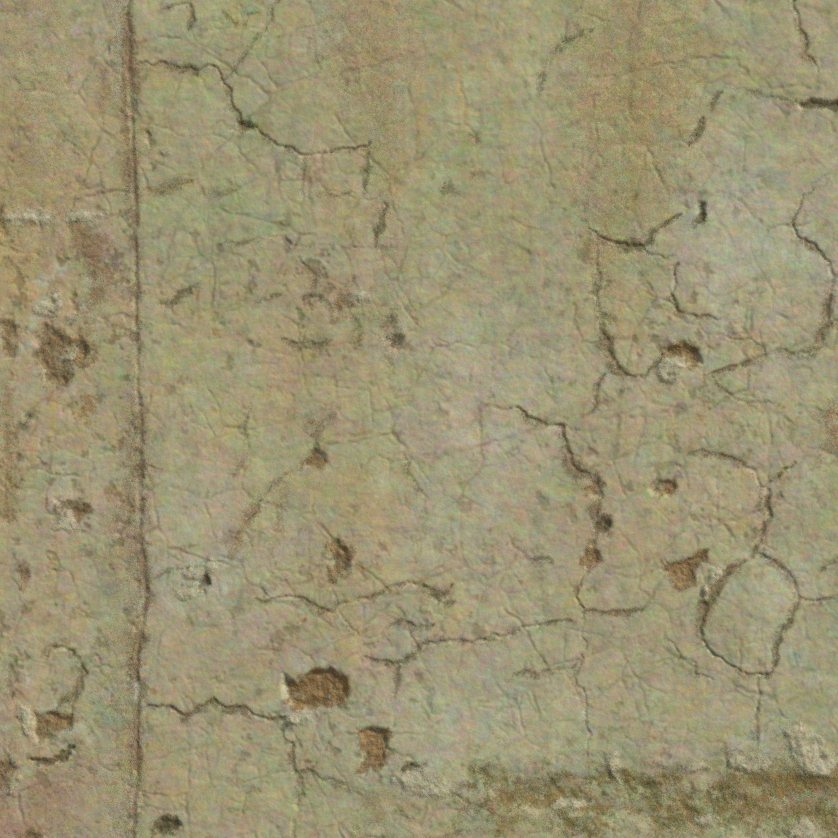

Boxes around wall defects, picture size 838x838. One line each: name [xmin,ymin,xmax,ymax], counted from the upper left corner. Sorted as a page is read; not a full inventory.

spalling [31,288,95,391]
crack [75,0,389,838]
crack [508,405,605,545]
crack [587,212,717,415]
spalling [655,339,704,385]
crack [705,191,838,406]
spalling [281,663,353,727]
spalling [355,724,456,800]
crack [256,576,654,756]
water stain [454,748,838,838]
spalling [655,548,725,599]
crack [672,448,838,745]